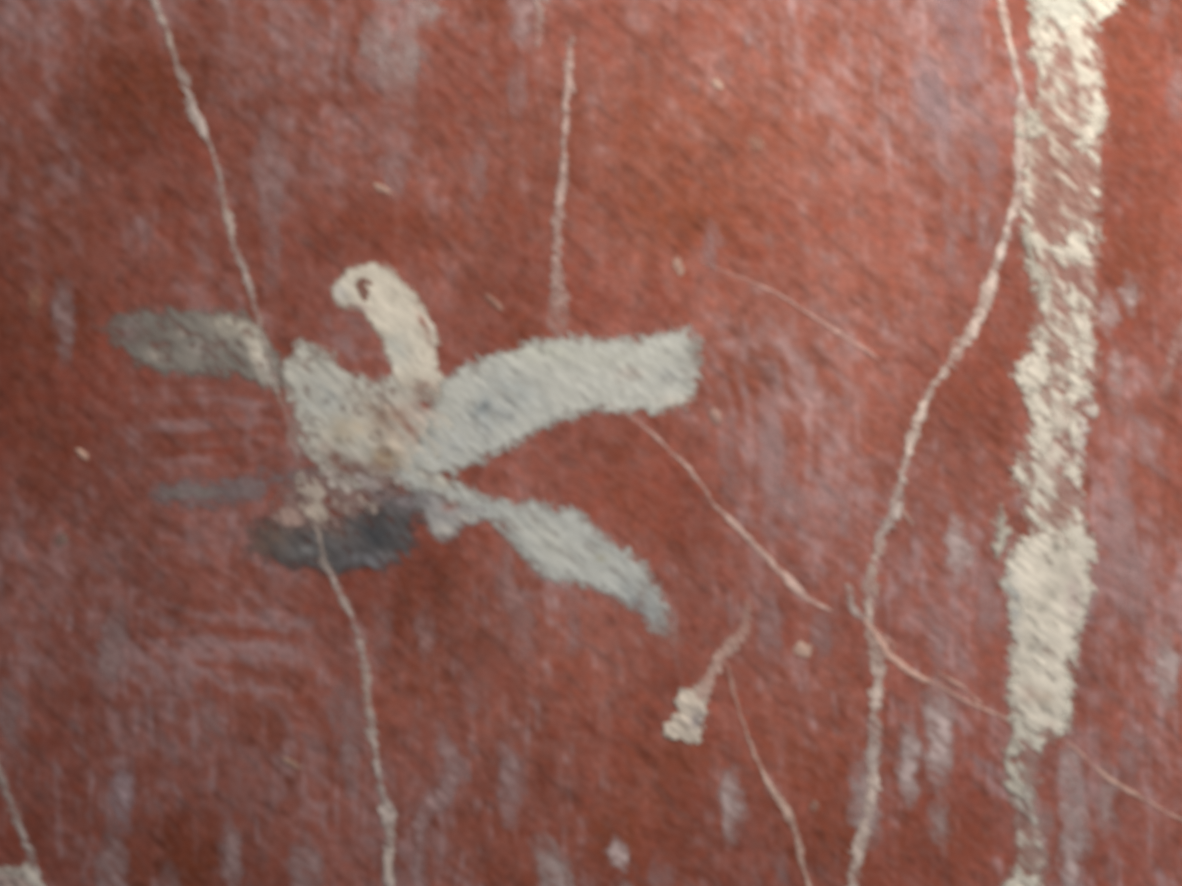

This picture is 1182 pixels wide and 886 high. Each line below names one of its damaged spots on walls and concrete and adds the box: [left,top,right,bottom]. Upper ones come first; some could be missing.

crack [152,0,279,394]
crack [550,49,575,306]
crack [650,432,699,481]
crack [714,0,1029,886]
crack [0,767,45,886]
crack [315,527,397,886]
damp [1060,803,1085,886]
crack [1072,746,1182,820]